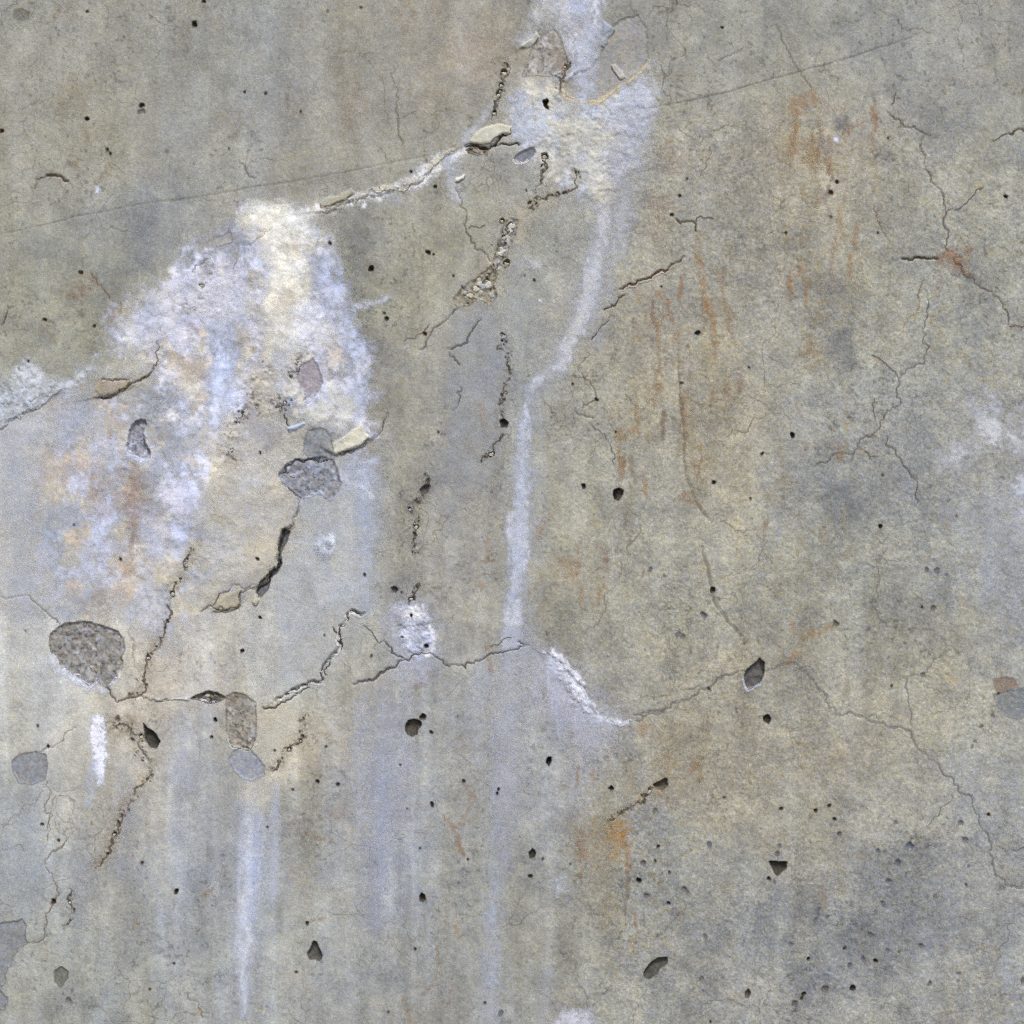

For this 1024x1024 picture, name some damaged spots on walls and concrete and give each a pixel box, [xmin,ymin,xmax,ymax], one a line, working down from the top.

leakage [0,104,494,759]
spalling [278,421,370,501]
crack [323,62,579,462]
leakage [444,301,512,485]
leakage [463,0,659,656]
crack [205,527,289,610]
spalling [12,745,50,785]
spalling [49,620,125,689]
crack [100,548,194,866]
spalling [190,691,265,781]
crack [263,610,737,771]
spalling [0,918,28,1010]